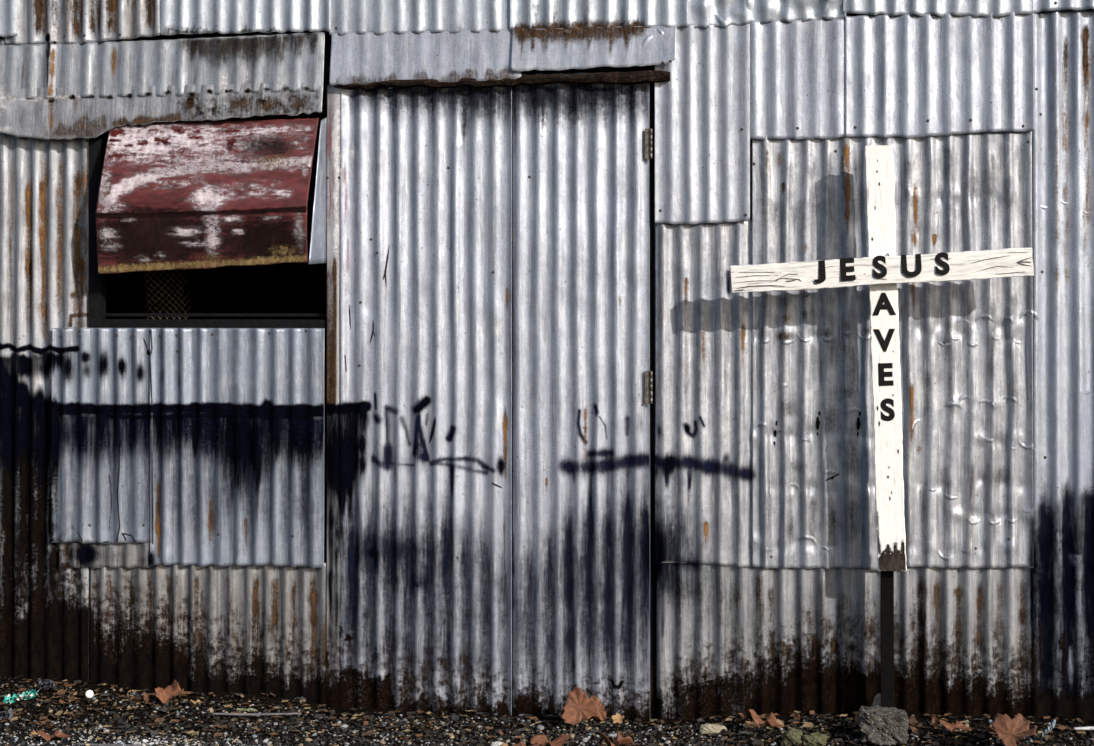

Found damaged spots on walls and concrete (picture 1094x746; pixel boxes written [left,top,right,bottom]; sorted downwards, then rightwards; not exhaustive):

corrosion [34,0,318,137]
corrosion [514,14,644,51]
corrosion [1082,25,1090,88]
corrosion [25,165,306,337]
peeling [99,123,312,252]
corrosion [241,138,293,168]
corrosion [0,527,881,722]
corrosion [894,609,1094,722]